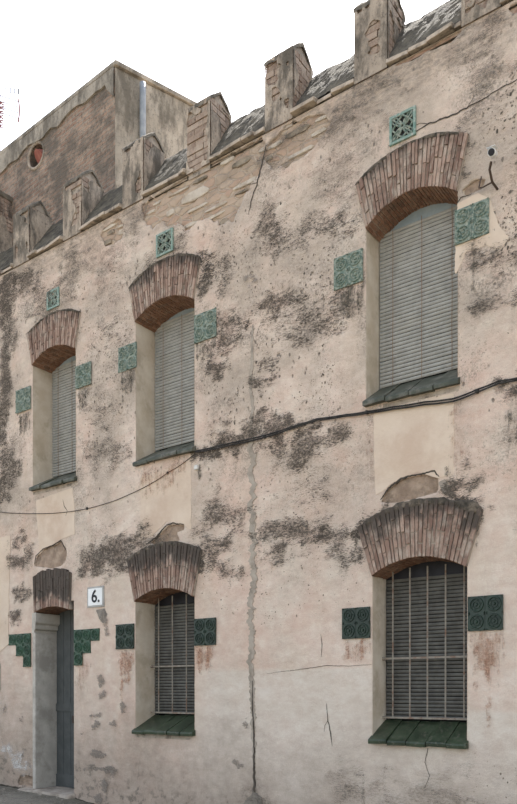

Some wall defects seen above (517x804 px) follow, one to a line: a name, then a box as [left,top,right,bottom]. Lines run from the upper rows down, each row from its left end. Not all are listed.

crack [416,79,517,132]
spalling [142,115,330,231]
spalling [382,475,439,503]
spalling [35,542,67,569]
crack [243,325,333,804]